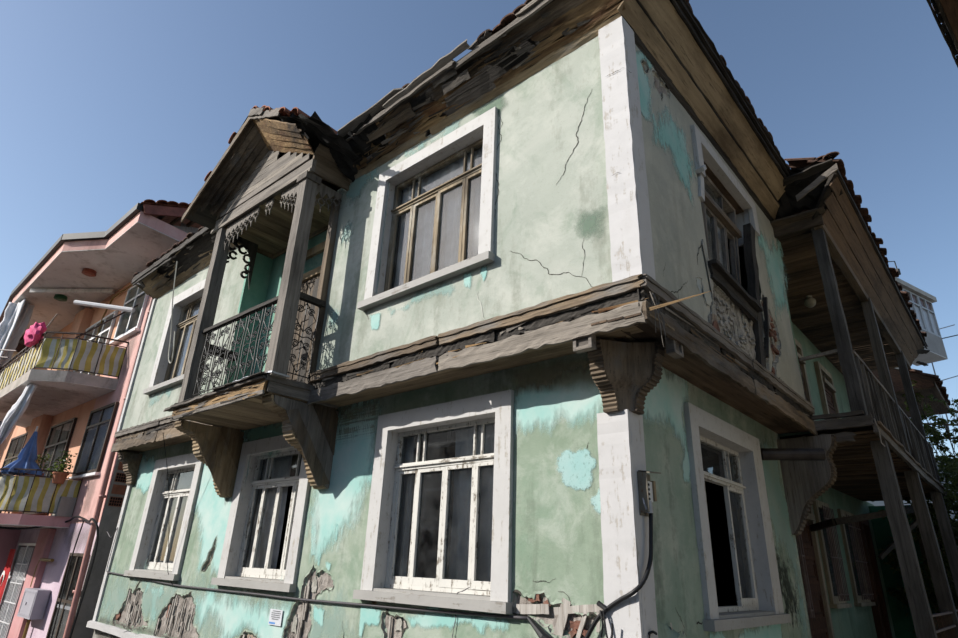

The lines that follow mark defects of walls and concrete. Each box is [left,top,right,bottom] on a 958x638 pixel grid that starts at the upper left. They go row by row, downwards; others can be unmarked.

peeling [636,51,695,201]
crack [511,242,591,286]
peeling [557,449,601,513]
peeling [112,399,381,638]
flaking render [359,586,604,638]